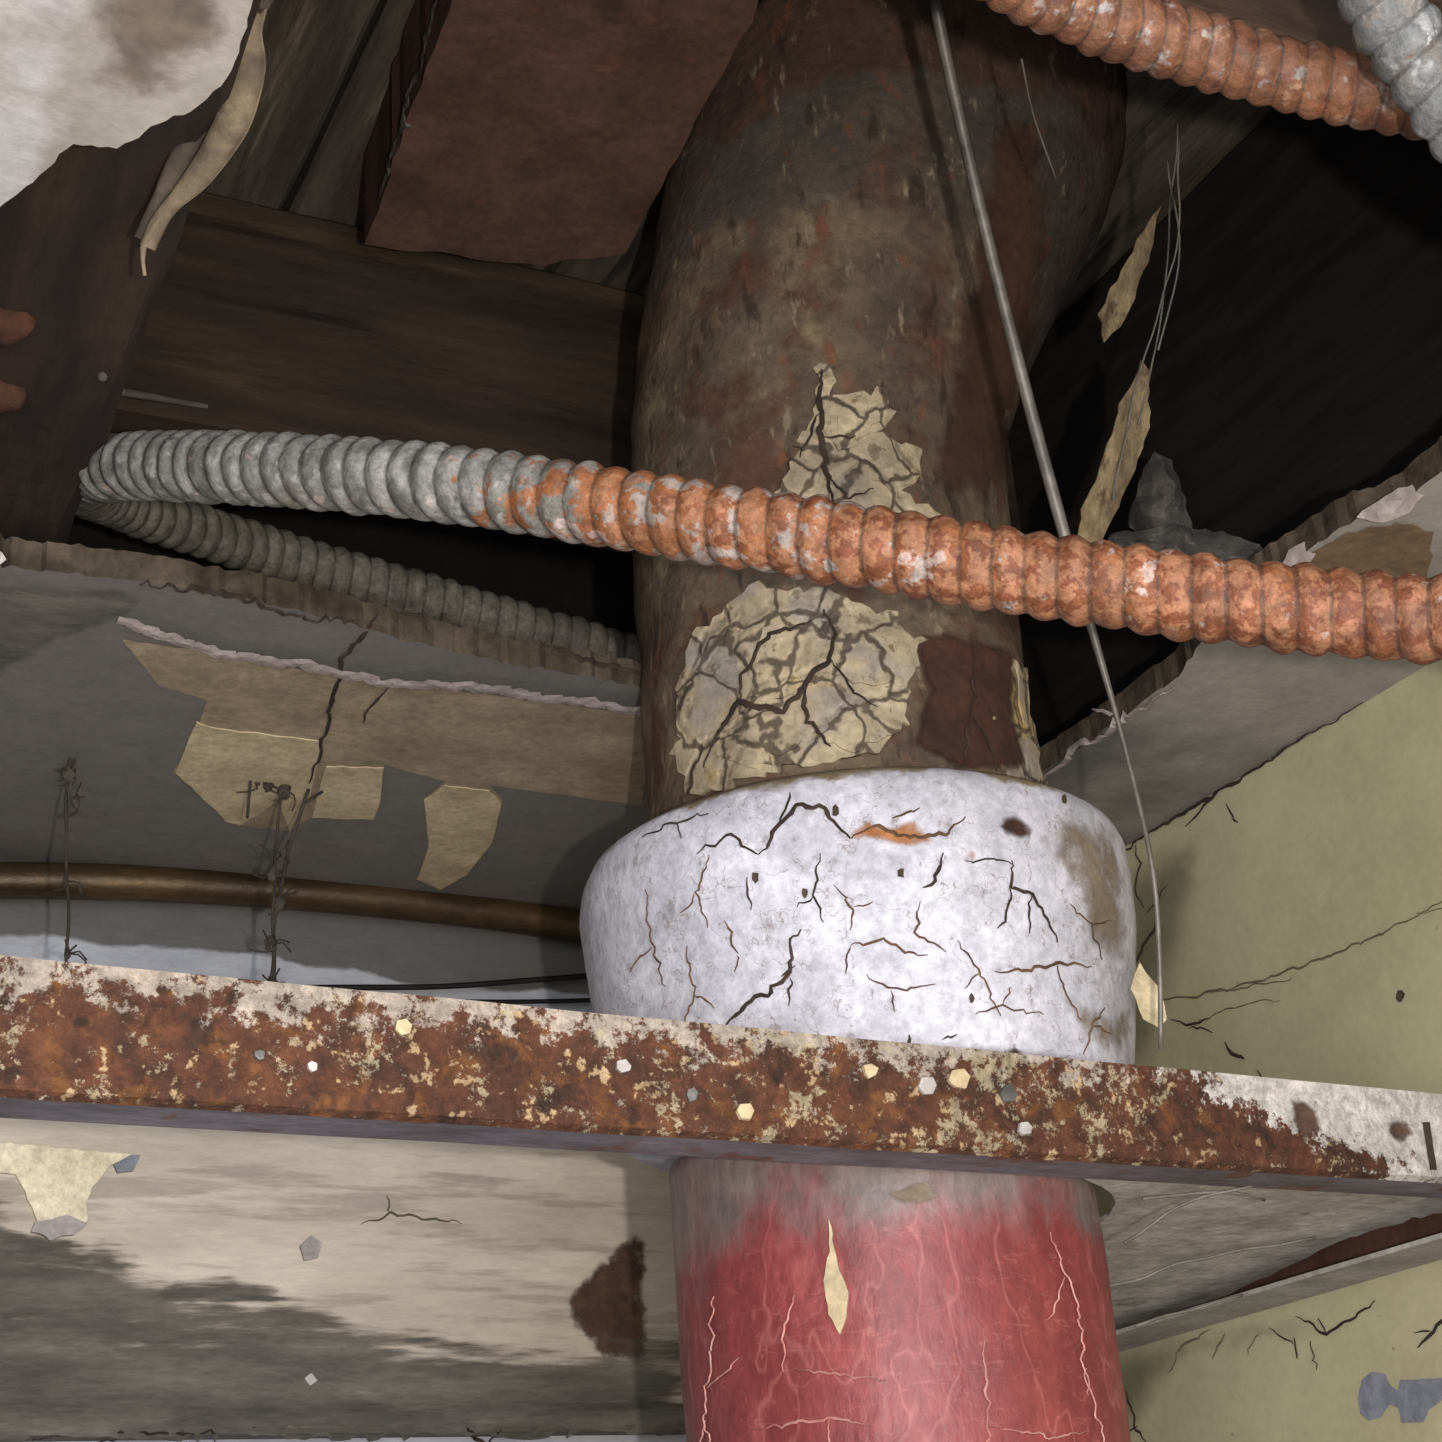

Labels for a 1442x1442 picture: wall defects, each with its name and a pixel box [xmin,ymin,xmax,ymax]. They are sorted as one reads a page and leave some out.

water stain [115,0,211,80]
peeling [134,0,275,276]
corrosion [942,126,1044,492]
peeling [774,362,941,518]
crack [139,580,424,784]
peeling [116,616,645,891]
peeling [669,580,929,796]
crack [629,702,1363,1054]
crack [1163,902,1442,1077]
corrosion [1294,1102,1319,1136]
water stain [0,1227,685,1442]
crack [699,1296,739,1442]